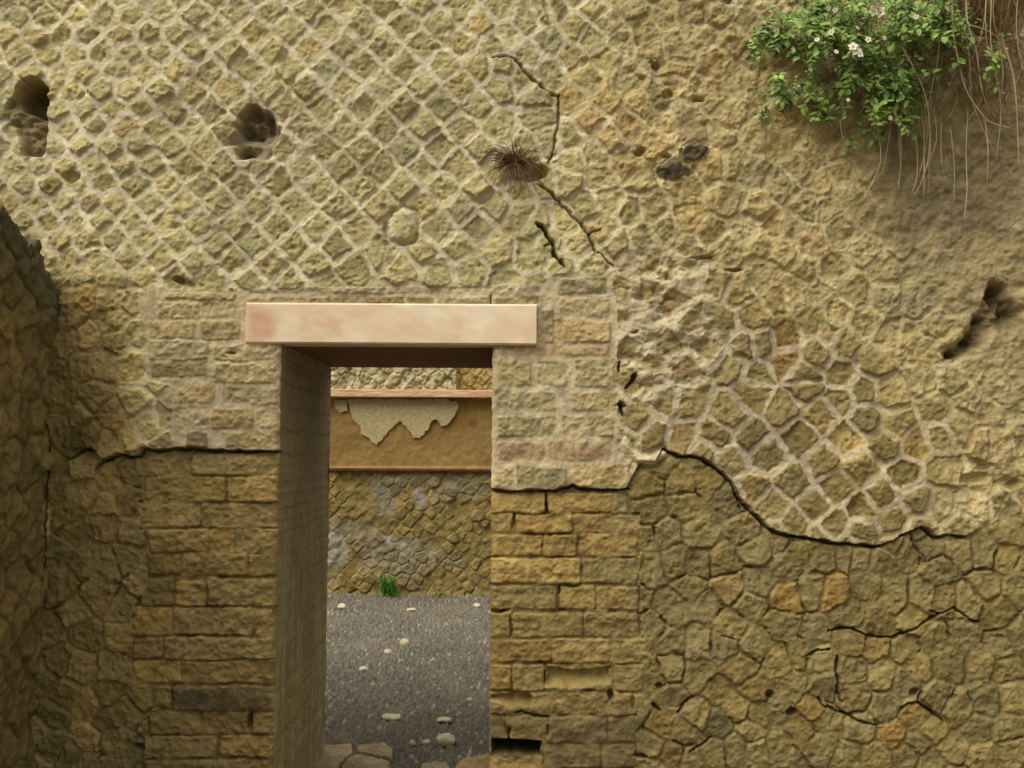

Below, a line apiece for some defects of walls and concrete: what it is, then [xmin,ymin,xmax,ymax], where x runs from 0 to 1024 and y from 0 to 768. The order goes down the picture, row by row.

crack [491,53,616,269]
spalling [938,277,1024,365]
flaking render [335,398,459,445]
crack [41,423,283,570]
crack [491,483,630,514]
crack [661,447,968,560]
crack [651,695,695,713]
crack [688,735,714,754]
crack [805,605,981,727]